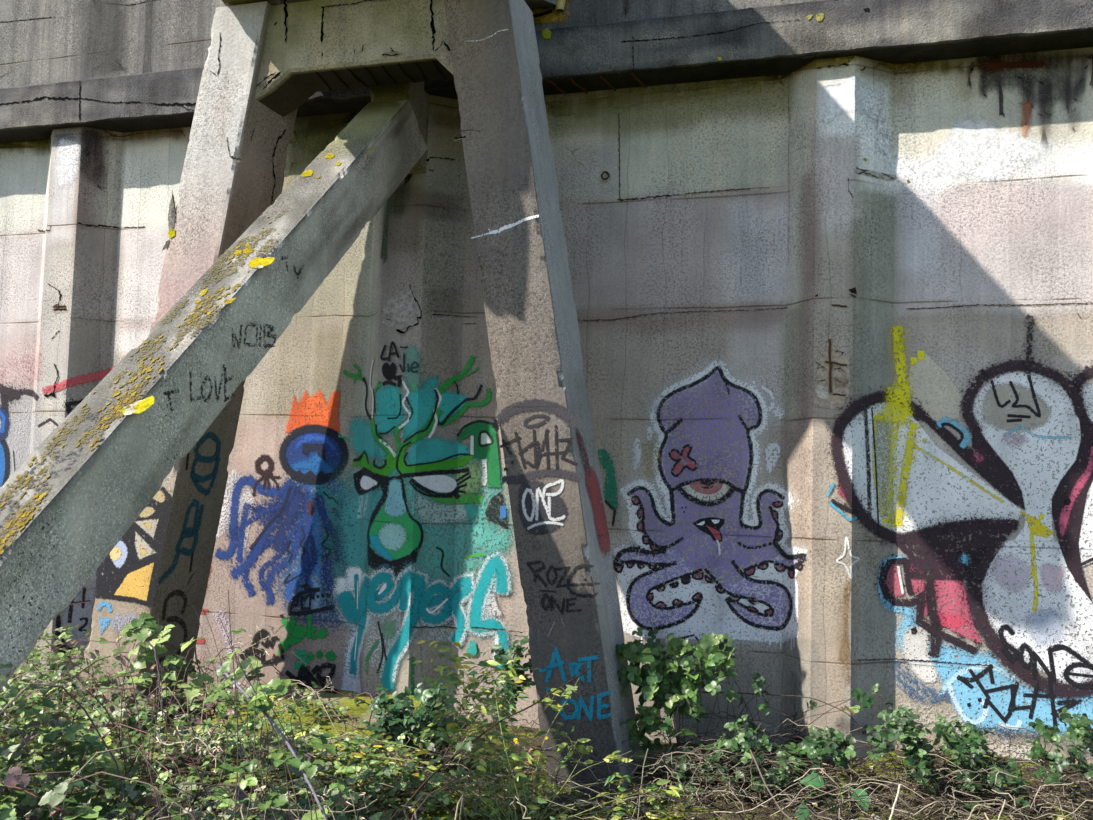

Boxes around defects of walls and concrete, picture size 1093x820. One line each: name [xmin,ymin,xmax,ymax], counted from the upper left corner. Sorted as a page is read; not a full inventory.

crack [428,0,436,50]
spalling [382,285,421,330]
spalling [814,339,850,409]